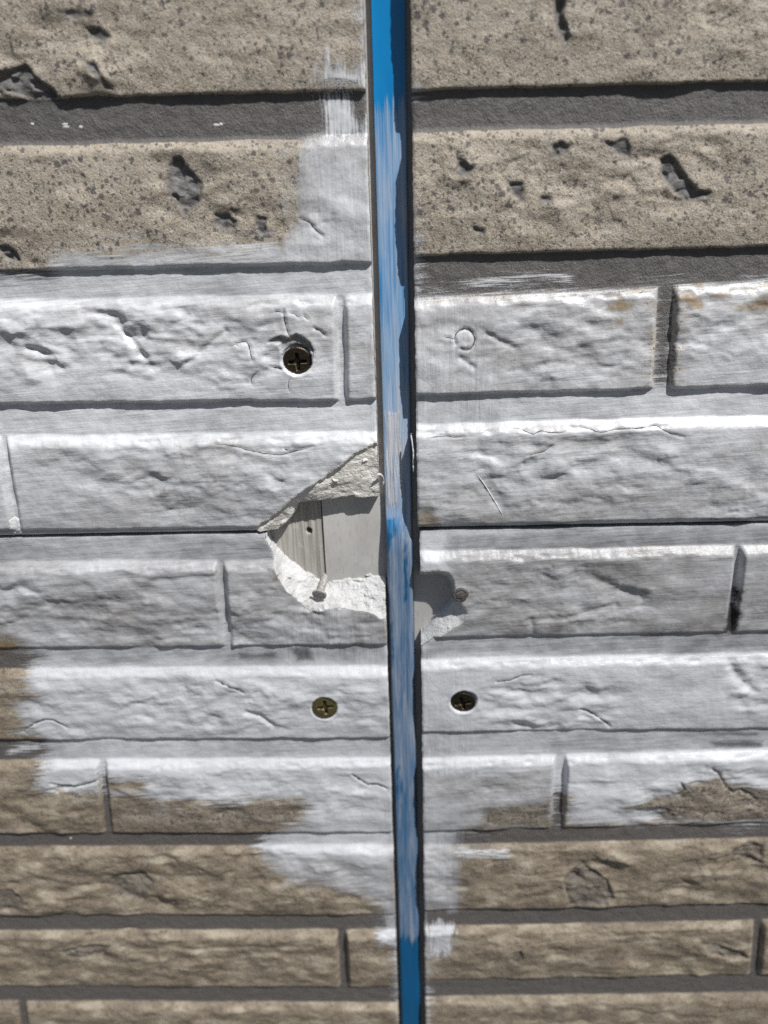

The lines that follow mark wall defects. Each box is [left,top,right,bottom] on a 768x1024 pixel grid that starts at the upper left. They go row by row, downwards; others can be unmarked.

spalling [255,437,386,620]
spalling [419,563,468,647]